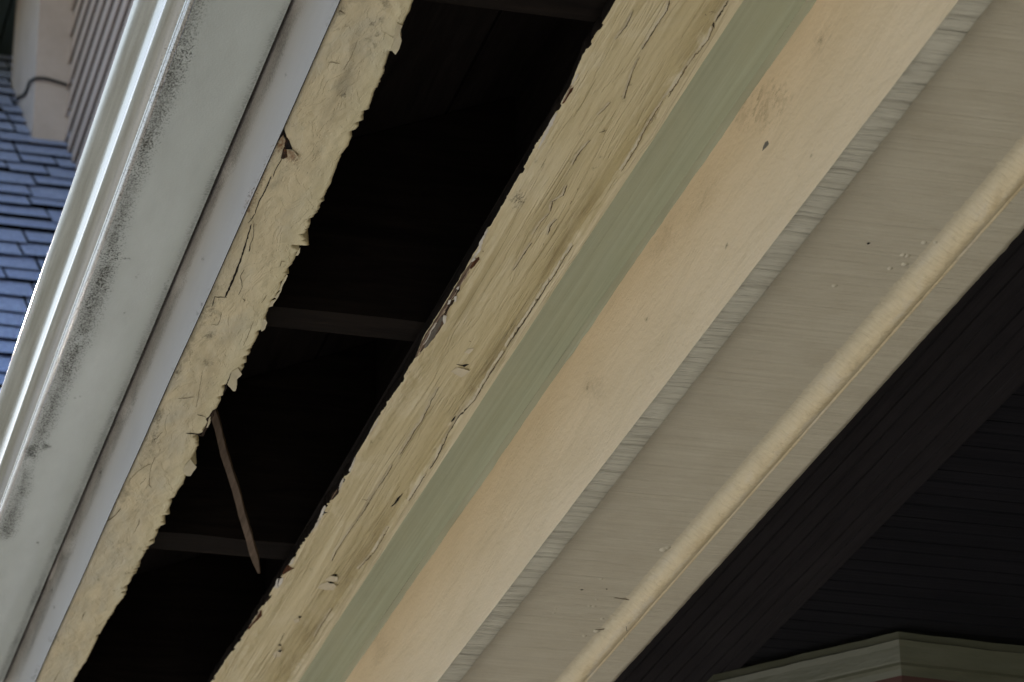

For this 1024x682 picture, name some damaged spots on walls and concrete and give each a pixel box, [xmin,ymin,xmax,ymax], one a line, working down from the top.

peeling [391,22,403,55]
crack [619,0,728,172]
spalling [276,130,298,162]
leakage [25,24,192,459]
crack [212,159,282,346]
crack [330,0,670,570]
peeling [227,368,242,391]
peeling [183,459,197,476]
peeling [311,458,355,533]
peeling [248,558,295,629]